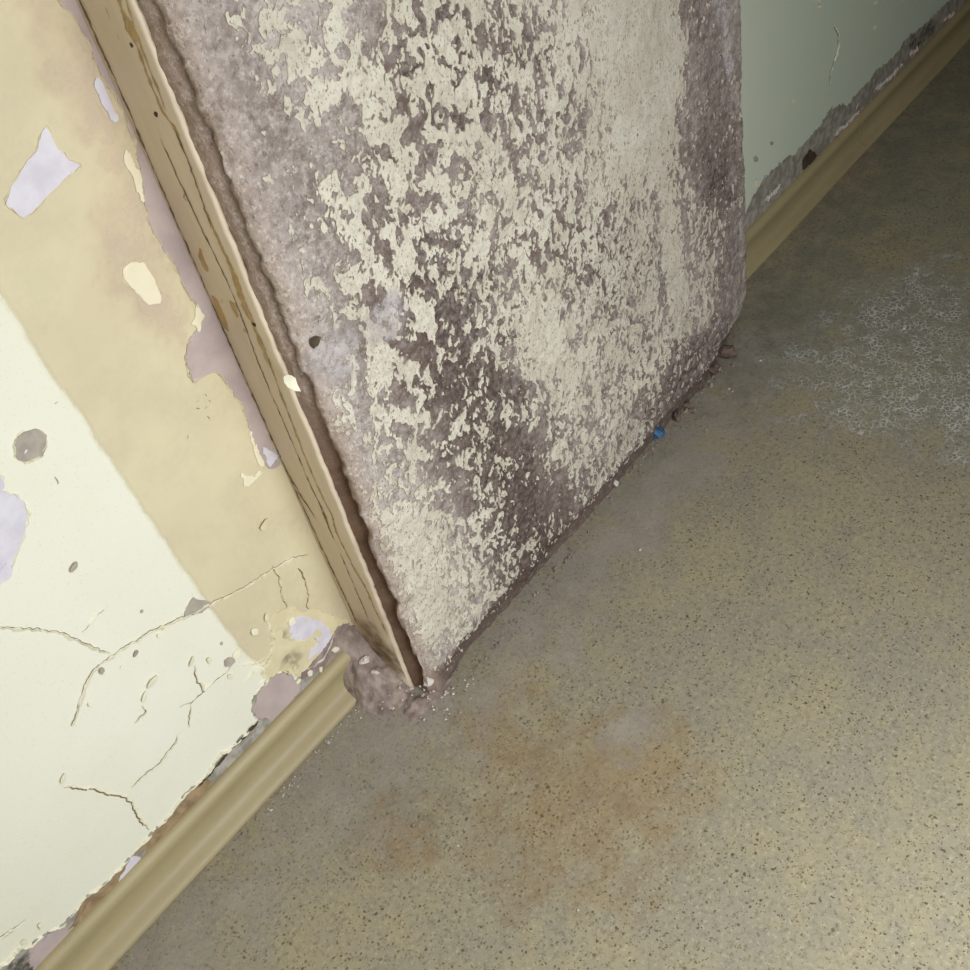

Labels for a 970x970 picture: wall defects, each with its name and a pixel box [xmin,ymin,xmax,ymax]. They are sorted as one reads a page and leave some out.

damp [714,0,734,75]
peeling [4,124,82,219]
peeling [57,0,281,486]
crack [0,0,387,726]
damp [308,330,357,380]
damp [369,292,400,340]
peeling [222,0,967,672]
spalling [12,428,48,465]
peeling [0,472,32,585]
damp [365,629,406,677]
crack [64,649,240,830]
peeling [0,605,356,970]